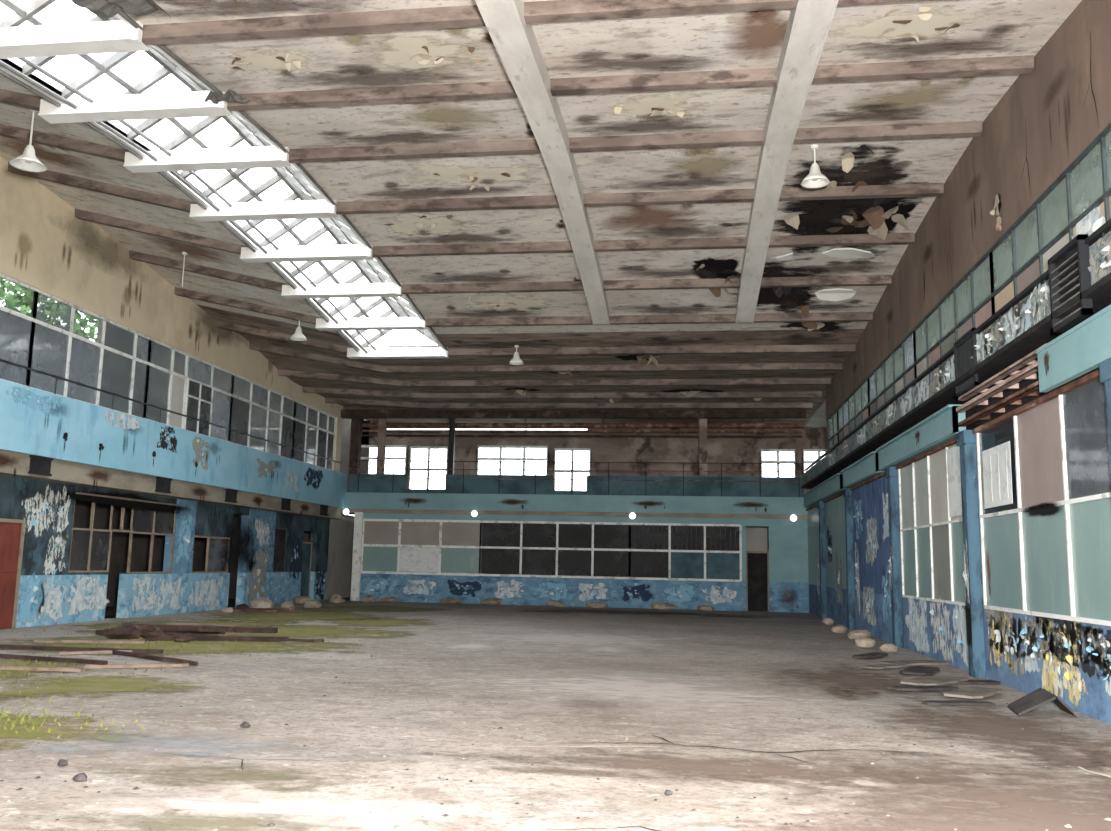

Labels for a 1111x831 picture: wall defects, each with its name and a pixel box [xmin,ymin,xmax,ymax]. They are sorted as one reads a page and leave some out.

peeling [776,145,909,250]
leakage [15,237,29,267]
leakage [79,225,141,315]
peeling [697,264,728,297]
peeling [1072,205,1111,283]
peeling [17,484,110,625]
peeling [985,609,1111,707]